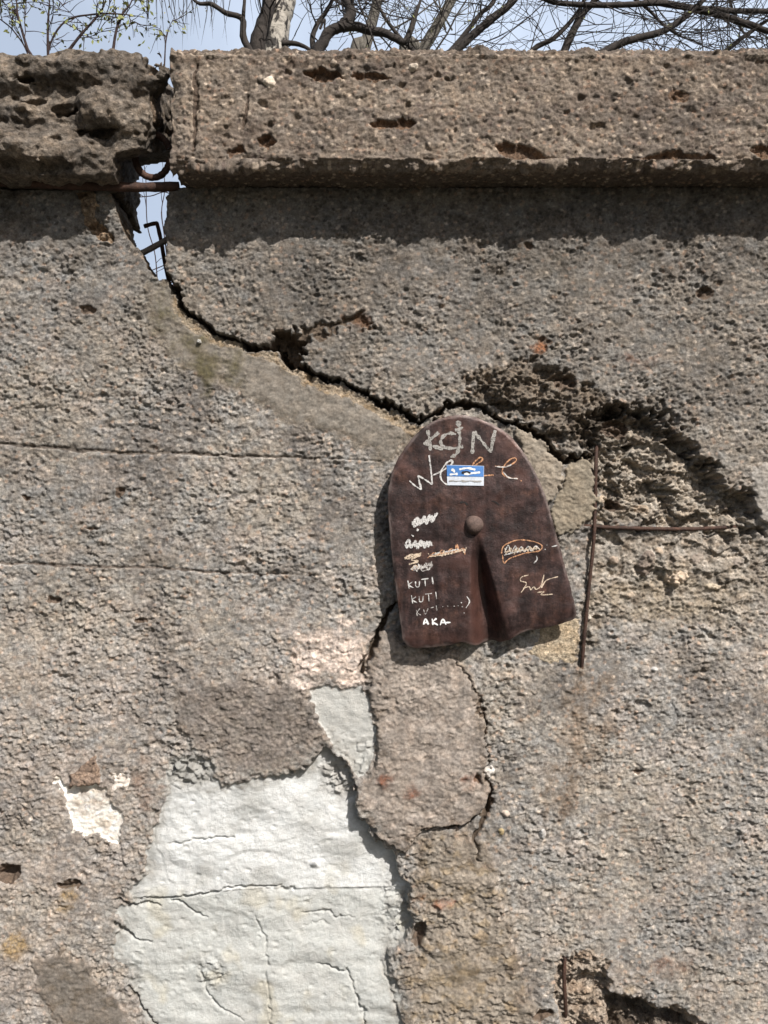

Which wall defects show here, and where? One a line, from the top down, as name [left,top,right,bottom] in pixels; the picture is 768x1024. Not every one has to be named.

crack [171,277,592,465]
spalling [509,408,768,667]
crack [358,602,396,673]
spalling [52,755,130,844]
crack [443,662,493,861]
spalling [552,949,707,1024]